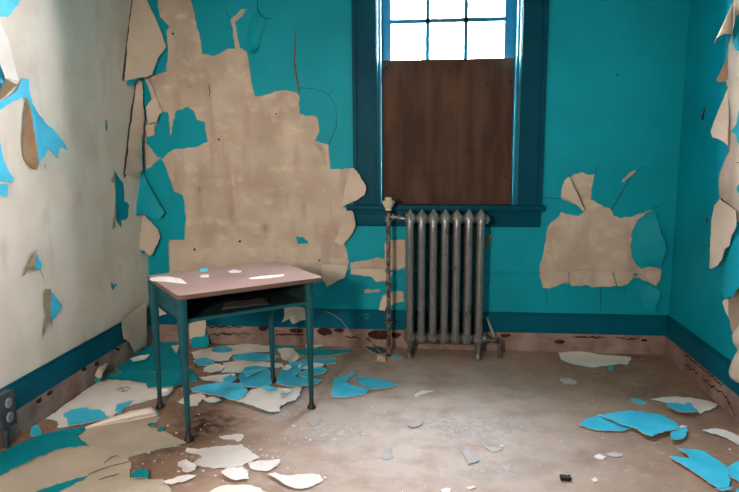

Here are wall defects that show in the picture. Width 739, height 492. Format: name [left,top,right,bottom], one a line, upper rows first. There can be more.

peeling [0,144,14,197]
peeling [0,0,68,170]
peeling [111,0,405,311]
crack [294,30,337,145]
peeling [706,0,739,333]
peeling [23,249,42,276]
peeling [42,289,62,337]
peeling [539,172,667,312]